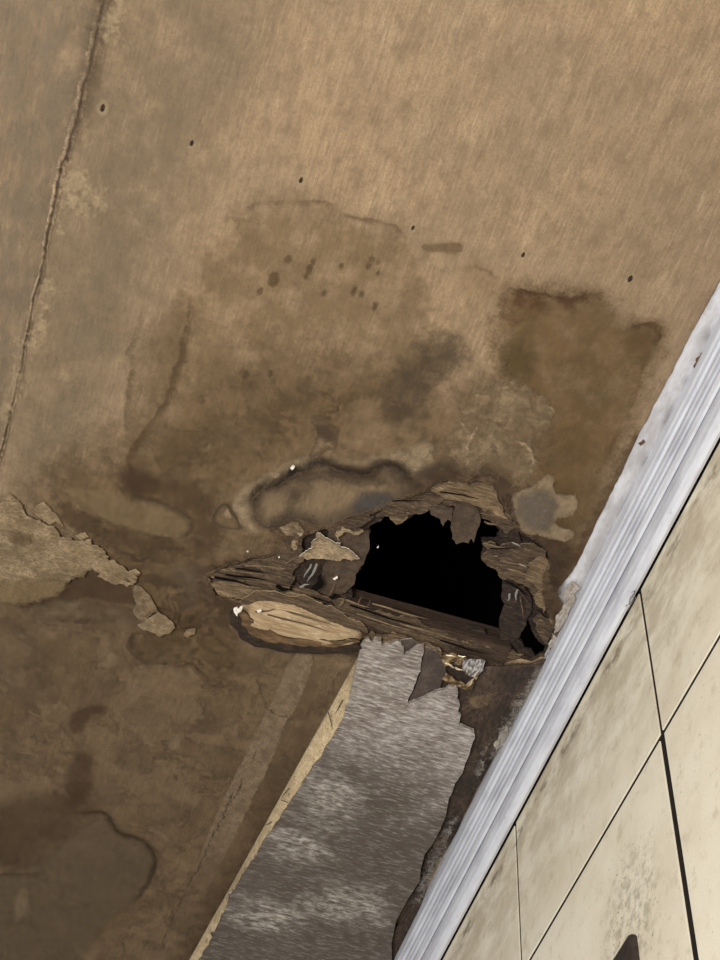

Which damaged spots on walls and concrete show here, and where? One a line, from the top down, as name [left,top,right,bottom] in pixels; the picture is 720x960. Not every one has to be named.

crack [0,0,112,462]
water stain [421,243,462,253]
peeling [0,493,196,637]
spalling [212,418,432,561]
water stain [0,289,662,960]
spalling [189,656,358,960]